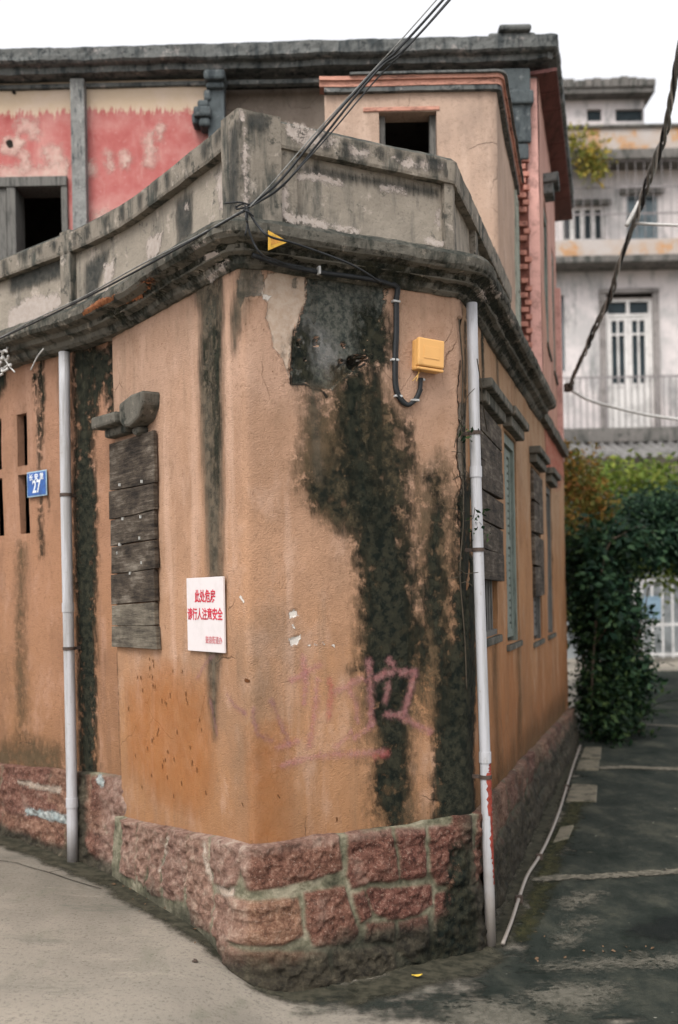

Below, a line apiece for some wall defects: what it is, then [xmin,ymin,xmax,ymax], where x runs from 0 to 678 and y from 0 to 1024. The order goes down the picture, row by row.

peeling [0,118,69,177]
peeling [88,124,165,176]
damp [216,110,268,210]
damp [417,156,448,176]
damp [86,250,114,300]
damp [146,232,162,260]
damp [176,195,192,242]
spalling [232,269,393,398]
damp [32,360,45,468]
damp [199,290,223,577]
damp [304,318,481,826]
damp [209,652,219,727]